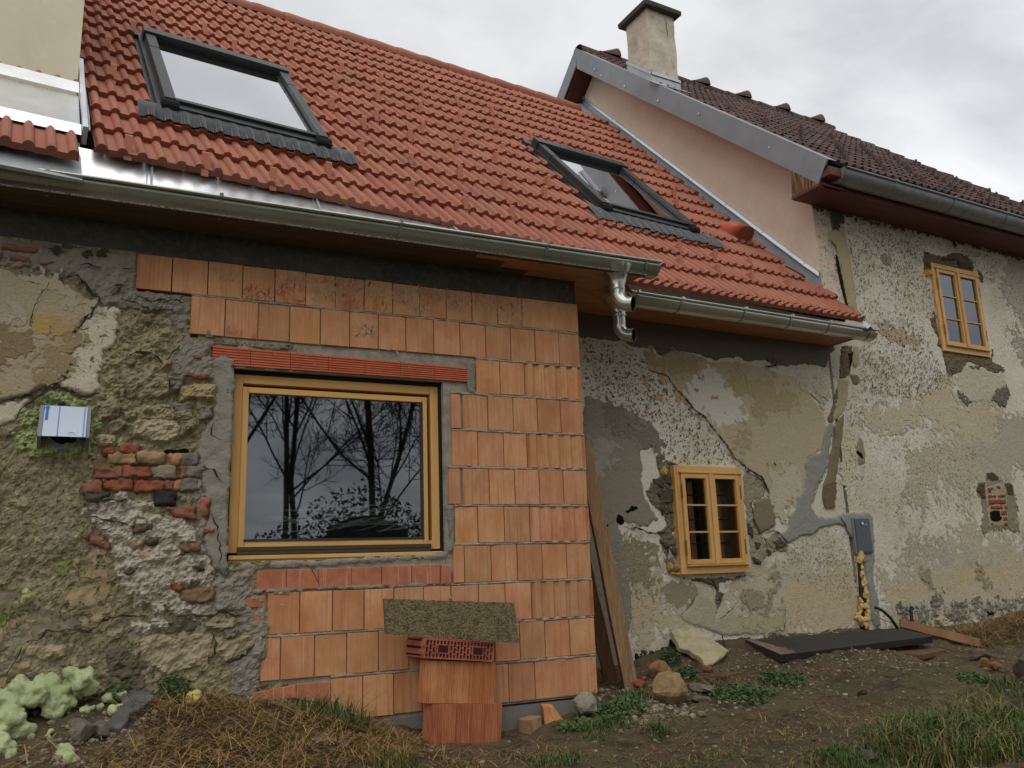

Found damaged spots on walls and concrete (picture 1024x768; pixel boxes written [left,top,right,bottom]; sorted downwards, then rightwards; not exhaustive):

spalling [923,252,984,283]
spalling [0,243,217,556]
peeling [682,363,749,433]
spalling [827,345,860,423]
spalling [930,312,1011,410]
crack [649,369,790,544]
spalling [128,521,159,566]
peeling [645,454,804,609]
spalling [975,471,1021,537]
flaking render [163,581,215,607]
spalling [25,644,67,661]
spalling [105,616,252,694]